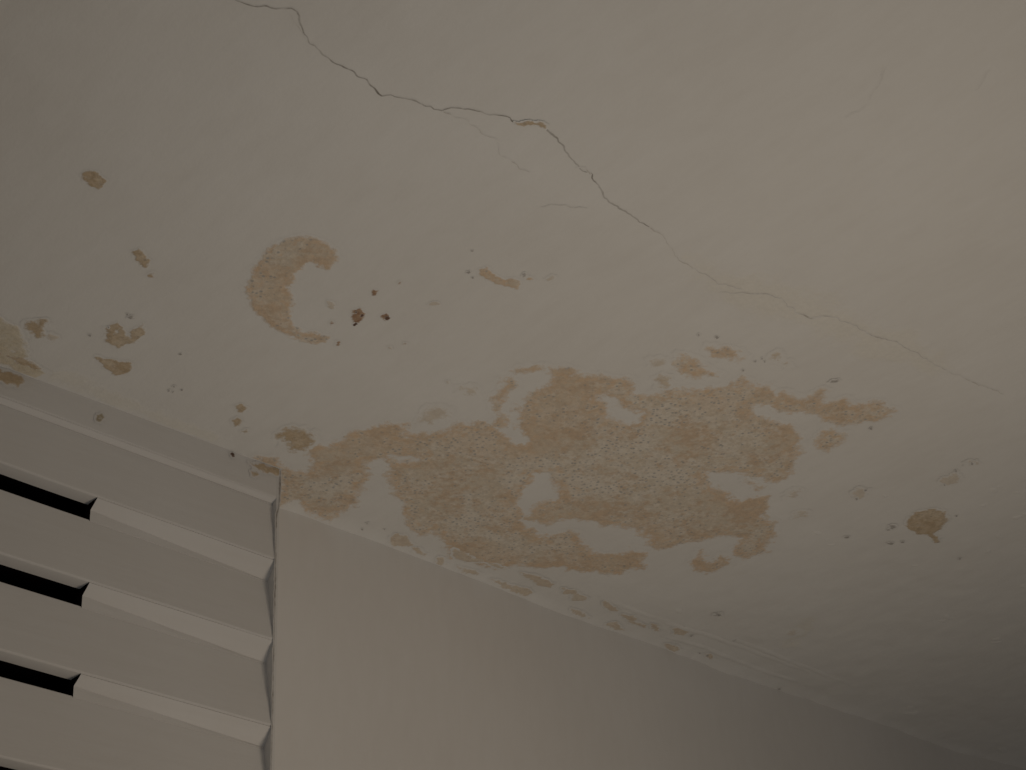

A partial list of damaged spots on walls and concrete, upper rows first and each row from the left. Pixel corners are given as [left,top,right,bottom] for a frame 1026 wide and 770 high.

peeling [79,169,110,192]
crack [234,0,1005,395]
peeling [87,313,148,378]
peeling [240,232,344,346]
peeling [247,333,903,578]
peeling [886,507,958,545]